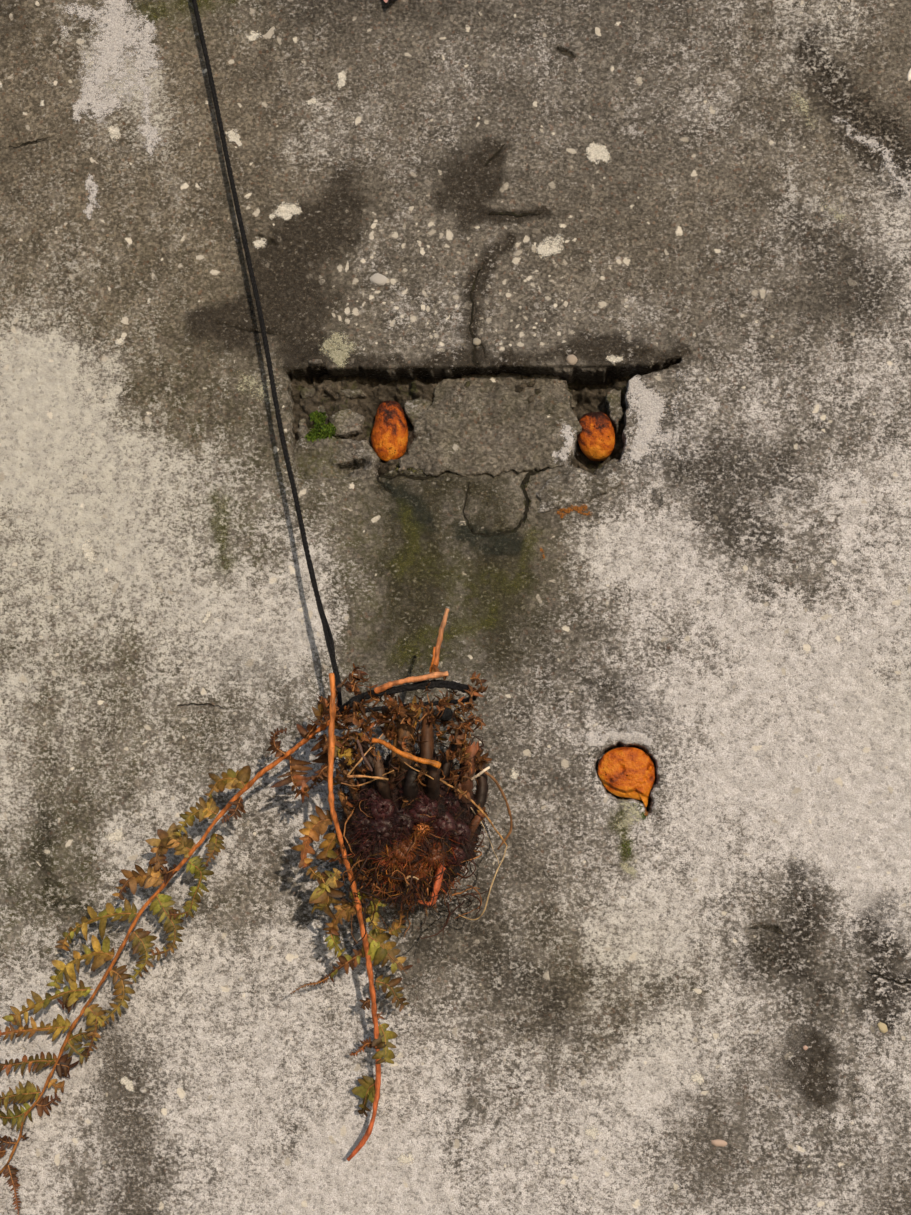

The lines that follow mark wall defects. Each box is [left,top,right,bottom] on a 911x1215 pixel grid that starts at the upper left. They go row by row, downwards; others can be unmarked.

crack [489,210,543,218]
crack [469,263,486,366]
leakage [186,139,794,490]
rust [371,400,408,462]
spalling [290,359,648,513]
rust [577,412,615,461]
leakage [722,510,778,547]
rust [597,747,655,816]
leakage [739,865,827,994]
leakage [787,1030,839,1109]